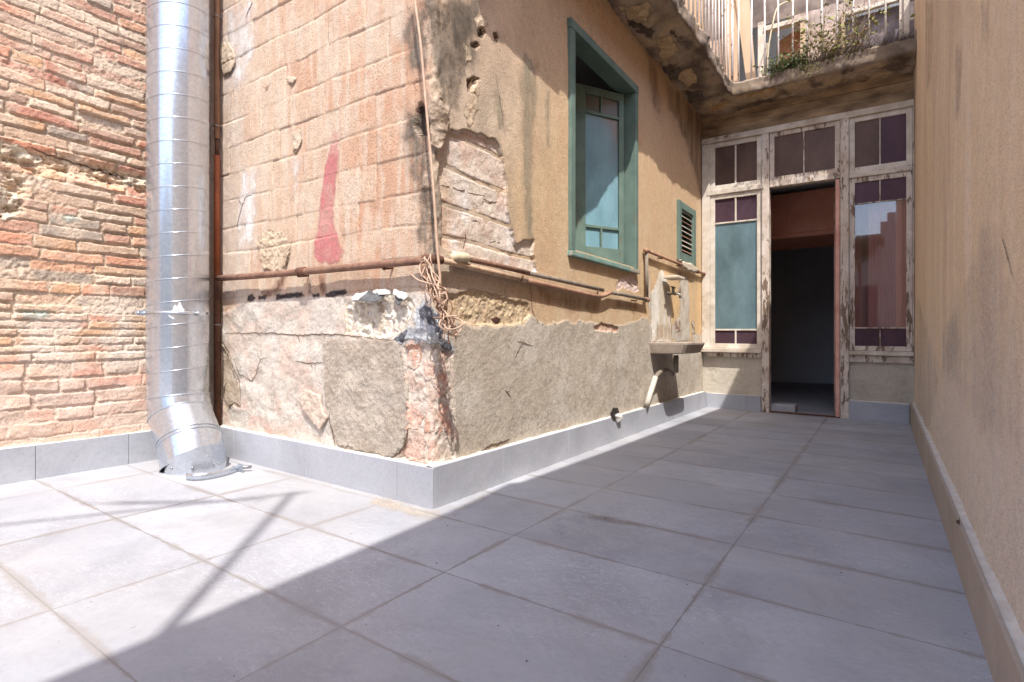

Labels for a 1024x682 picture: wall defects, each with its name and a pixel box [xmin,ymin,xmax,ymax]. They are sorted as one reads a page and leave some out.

leakage [404,0,478,108]
flaking render [463,15,498,64]
spalling [618,1,775,113]
leakage [404,114,442,254]
flaking render [414,77,538,327]
flaking render [298,390,328,430]
spalling [345,289,458,464]